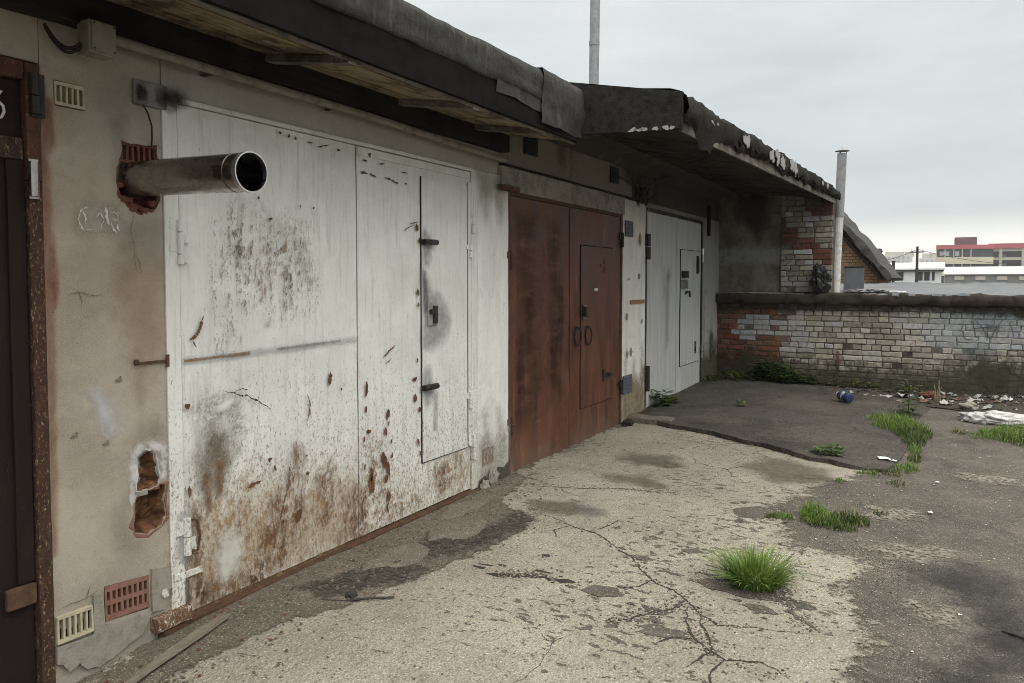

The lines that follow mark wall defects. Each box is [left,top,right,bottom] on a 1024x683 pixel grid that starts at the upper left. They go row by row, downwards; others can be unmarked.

spalling [78,140,160,234]
damp [424,232,449,346]
spalling [128,441,169,538]
damp [198,399,241,509]
crack [226,388,271,410]
rust [185,437,422,612]
rust [429,450,468,493]
crack [527,512,816,683]